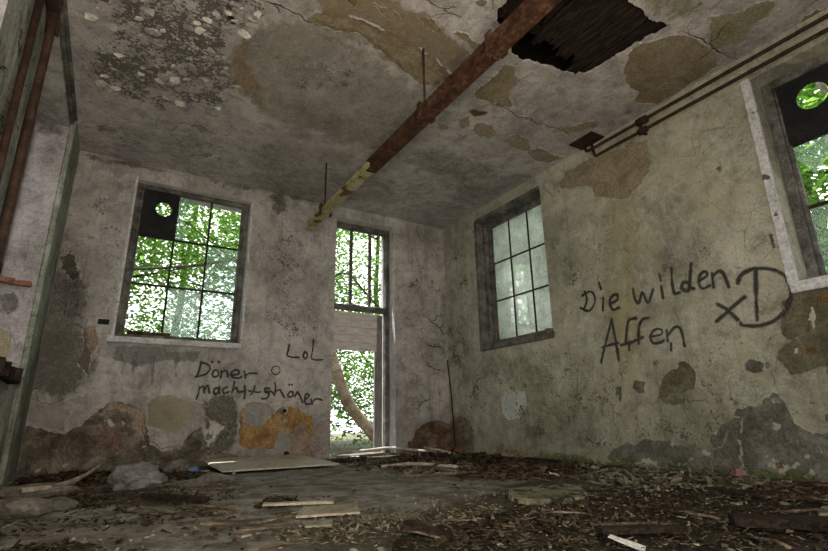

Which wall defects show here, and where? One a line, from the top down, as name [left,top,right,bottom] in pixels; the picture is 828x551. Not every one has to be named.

leakage [79,0,467,148]
peeling [305,0,452,86]
peeling [473,64,519,108]
peeling [560,0,775,134]
peeling [457,116,564,163]
peeling [559,138,653,203]
leakage [33,270,97,397]
flaking render [744,288,828,375]
flaking render [200,402,332,459]
peeling [561,349,647,427]